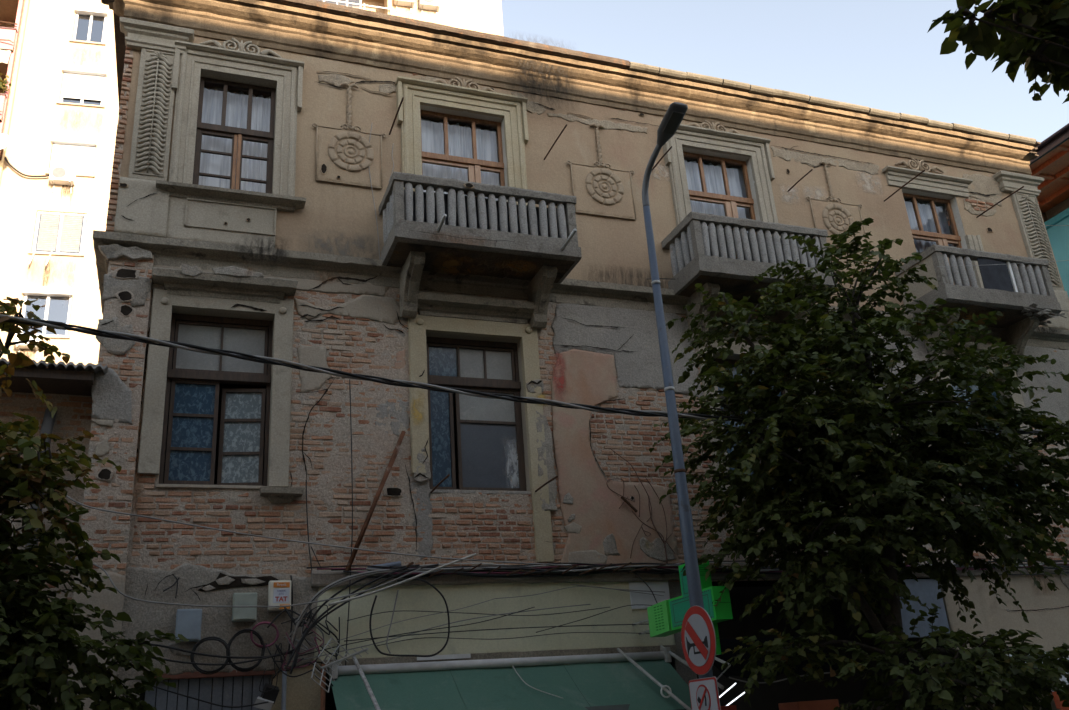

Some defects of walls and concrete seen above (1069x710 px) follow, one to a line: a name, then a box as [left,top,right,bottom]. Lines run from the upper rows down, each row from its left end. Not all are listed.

flaking render [95,244,152,355]
crack [298,276,377,322]
flaking render [294,295,401,325]
crack [560,317,636,352]
flaking render [297,344,331,393]
flaking render [90,364,132,427]
spalling [95,468,114,482]
spalling [383,487,405,497]
flaking render [551,349,698,567]